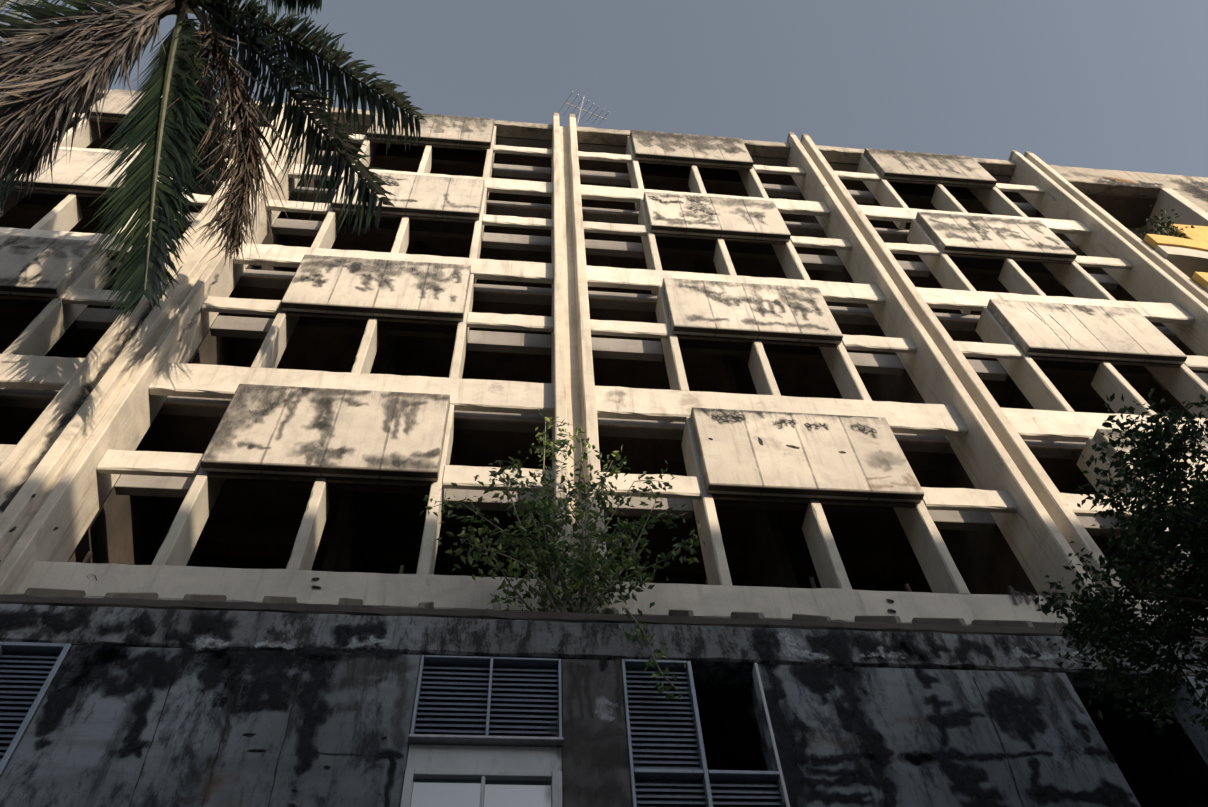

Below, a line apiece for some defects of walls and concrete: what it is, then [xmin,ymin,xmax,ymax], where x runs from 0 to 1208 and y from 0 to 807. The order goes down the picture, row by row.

water stain [0,238,50,284]
water stain [294,260,461,301]
water stain [680,285,828,330]
water stain [204,384,449,469]
water stain [693,407,872,418]
water stain [0,607,411,807]
water stain [752,625,1139,807]